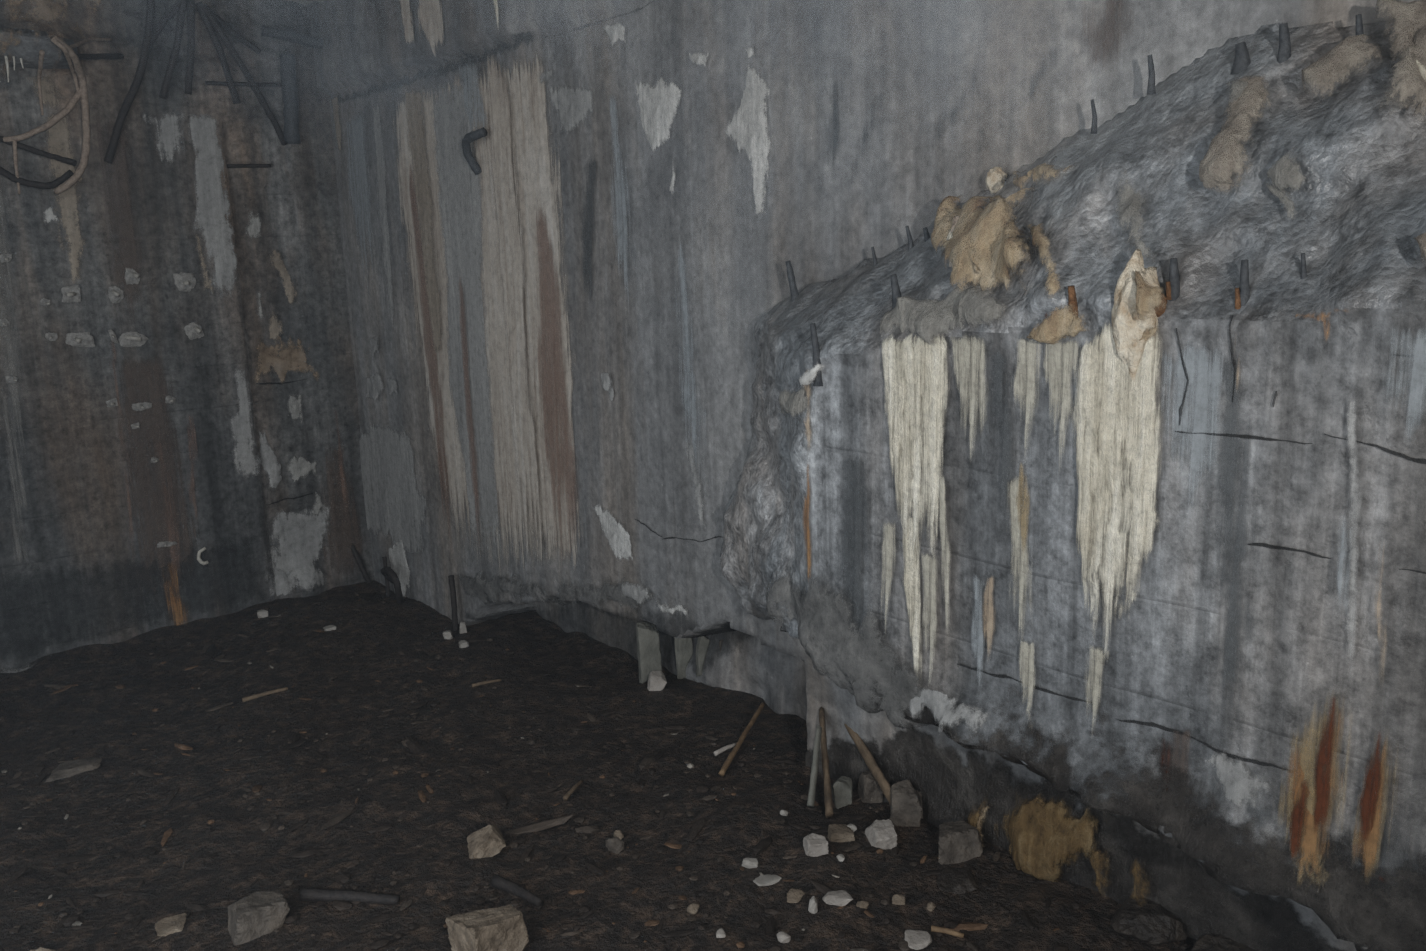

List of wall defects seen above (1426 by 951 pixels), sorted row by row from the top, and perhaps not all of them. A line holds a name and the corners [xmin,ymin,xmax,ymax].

peeling [143,112,271,294]
water stain [332,0,580,567]
peeling [725,47,771,214]
peeling [231,293,318,488]
water stain [952,337,1078,544]
crack [1175,315,1426,464]
peeling [269,494,329,596]
water stain [843,460,950,676]
crack [1247,543,1331,559]
crack [957,664,1293,772]
corrosion [1282,698,1339,873]
corrosion [1355,735,1387,868]